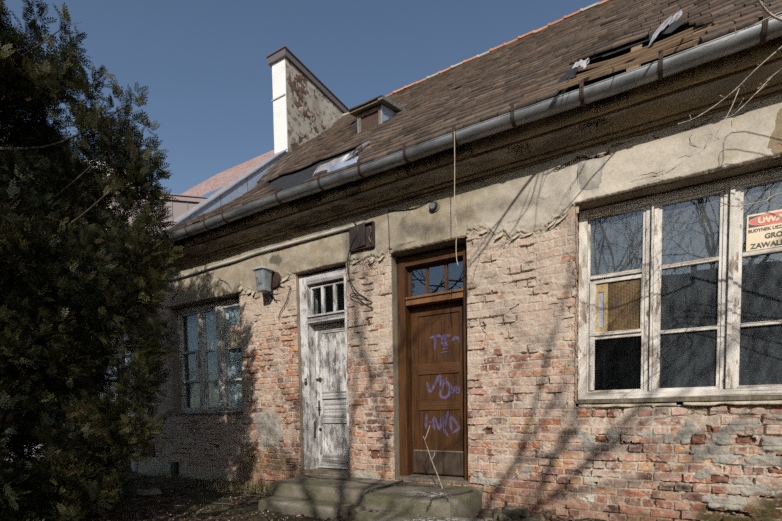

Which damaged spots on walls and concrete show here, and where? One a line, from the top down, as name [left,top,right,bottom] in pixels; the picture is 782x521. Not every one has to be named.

spalling [288,72,326,150]
crack [544,140,630,182]
peeling [467,202,579,242]
peeling [238,273,295,299]
spalling [691,427,711,444]